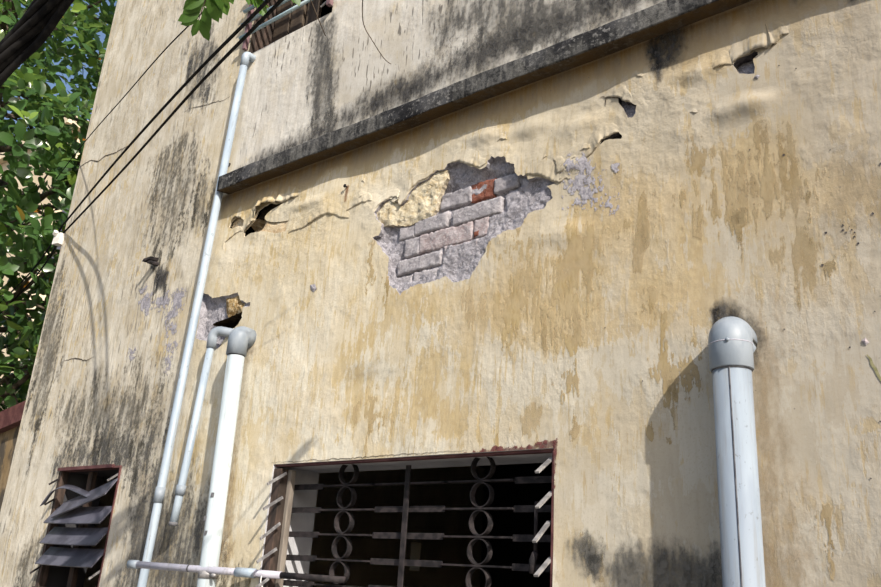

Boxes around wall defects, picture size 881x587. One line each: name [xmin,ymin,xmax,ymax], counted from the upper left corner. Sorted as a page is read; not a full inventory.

water stain [255,0,641,160]
flaking render [604,84,636,118]
water stain [646,28,683,80]
flaking render [713,20,789,79]
water stain [144,133,212,264]
flaking render [222,122,622,314]
flaking render [196,292,250,349]
peeling [474,209,609,405]
water stain [713,303,739,324]
water stain [26,266,207,587]
water stain [573,535,723,587]